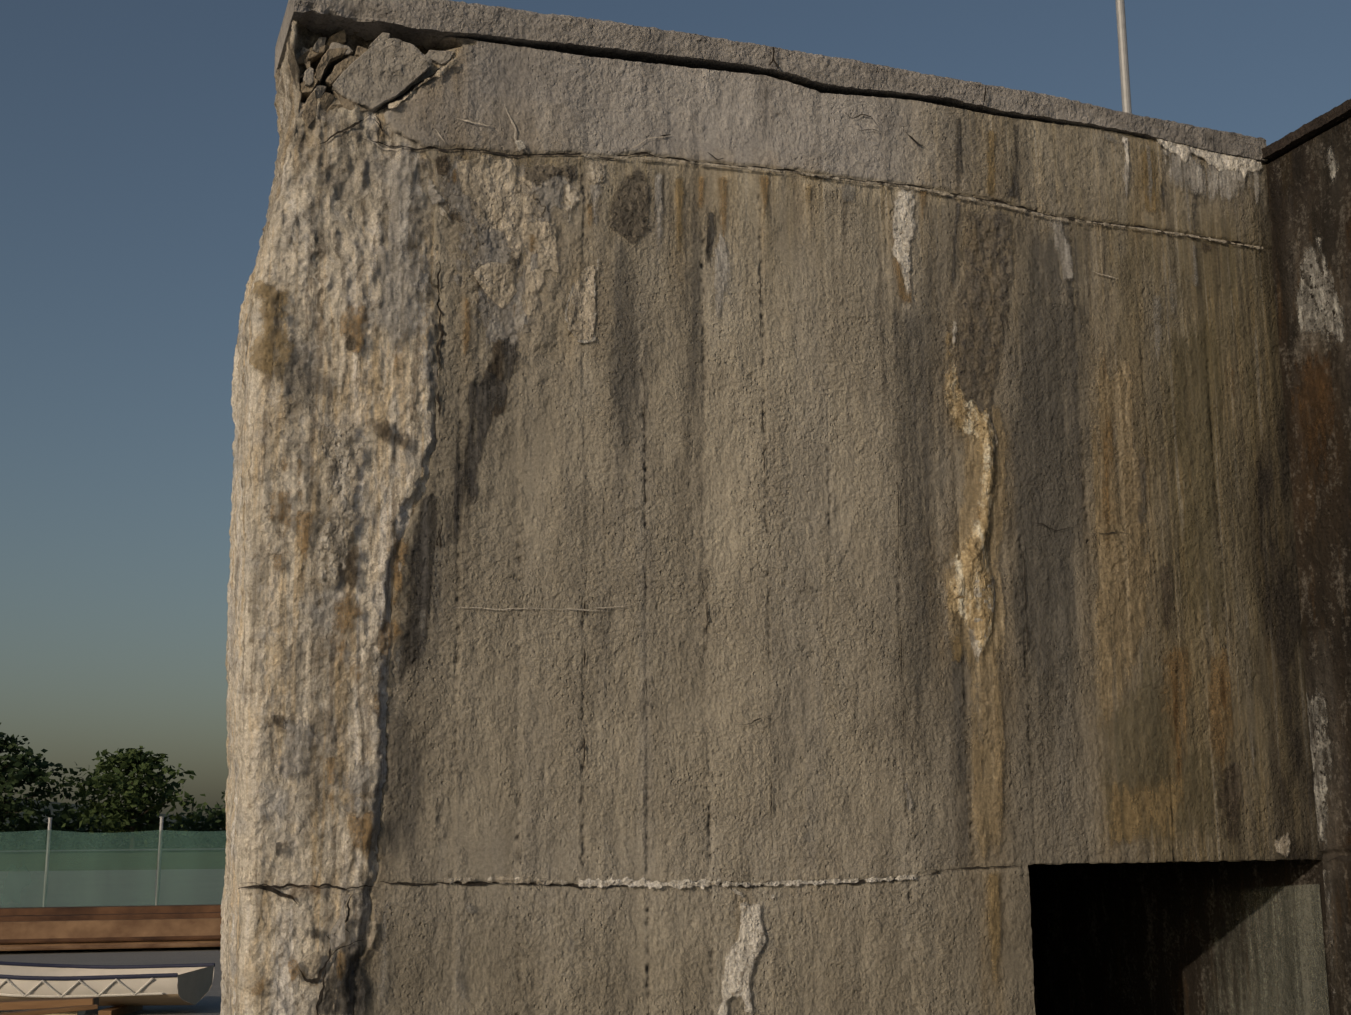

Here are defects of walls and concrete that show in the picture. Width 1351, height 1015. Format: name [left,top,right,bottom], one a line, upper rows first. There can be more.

crack [769,47,779,69]
crack [320,58,1263,249]
peeling [565,259,599,343]
water stain [1297,238,1344,342]
spalling [220,20,567,1015]
water stain [396,324,517,678]
crack [894,455,902,587]
water stain [1306,691,1332,844]
crack [238,885,297,904]
crack [298,865,1015,1015]
water stain [1274,833,1290,856]
water stain [1230,871,1336,1015]